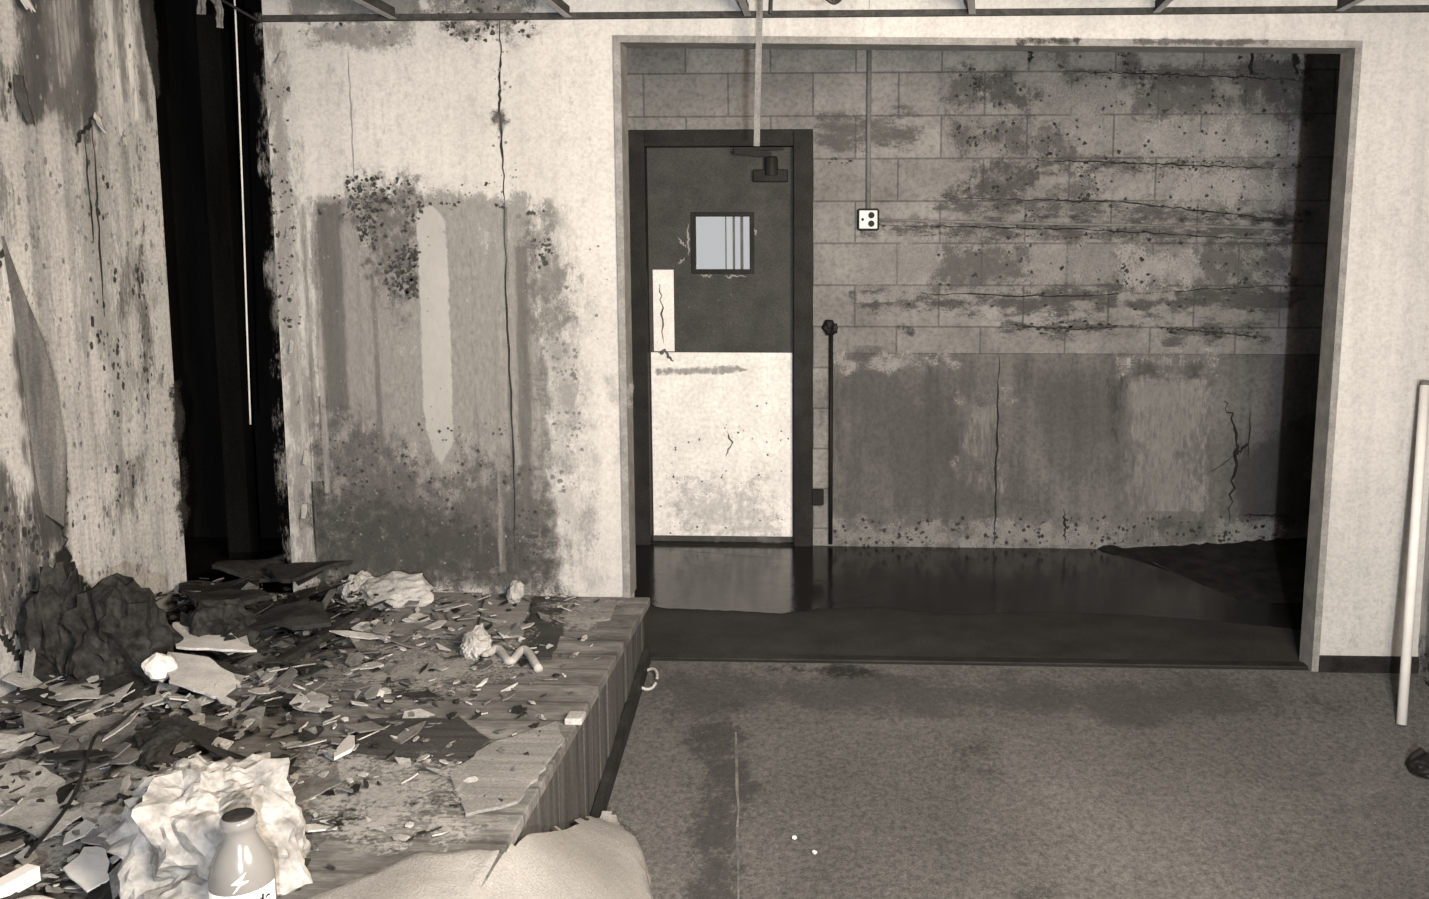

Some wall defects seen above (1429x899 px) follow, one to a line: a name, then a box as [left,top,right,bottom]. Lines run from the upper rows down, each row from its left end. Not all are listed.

damp [0,0,141,122]
damp [0,129,175,639]
damp [298,175,584,596]
crack [492,20,517,548]